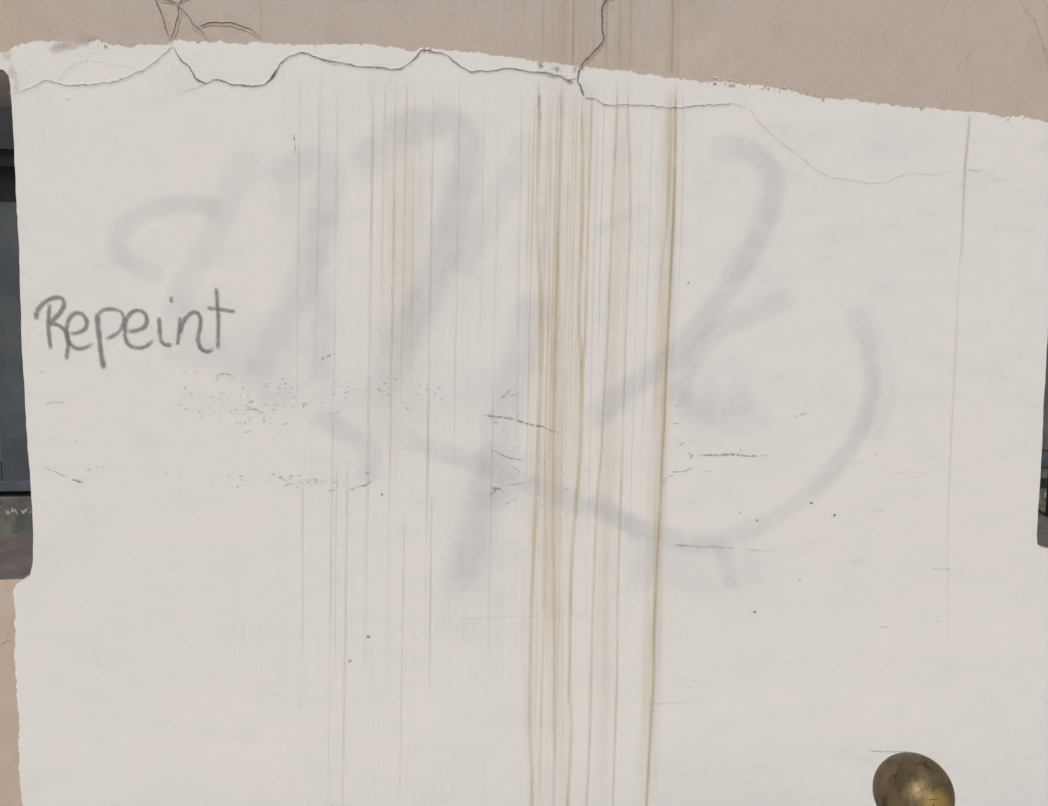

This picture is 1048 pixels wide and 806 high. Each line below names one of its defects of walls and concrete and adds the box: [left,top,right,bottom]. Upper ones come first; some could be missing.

crack [10,0,731,112]